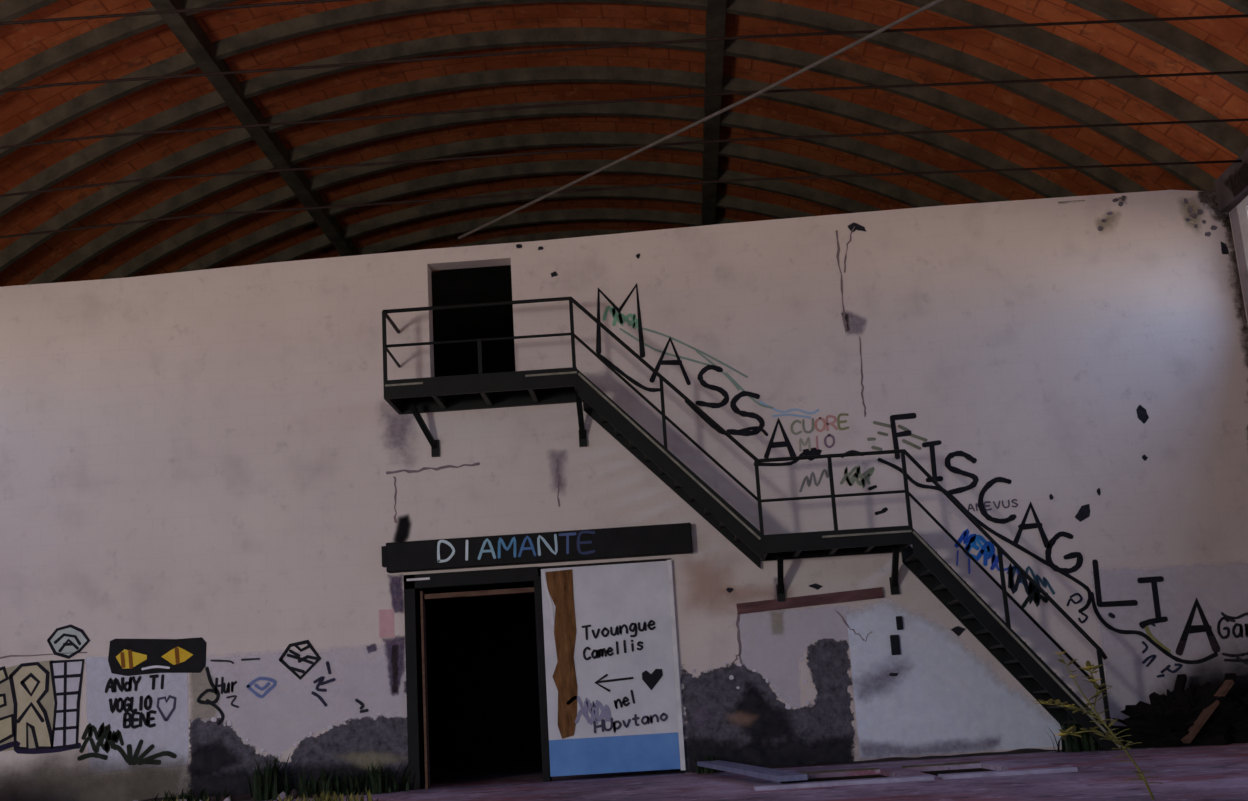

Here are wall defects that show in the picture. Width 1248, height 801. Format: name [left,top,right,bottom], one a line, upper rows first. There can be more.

leakage [1221,225,1248,366]
flaking render [187,713,408,796]
flaking render [680,638,1078,791]